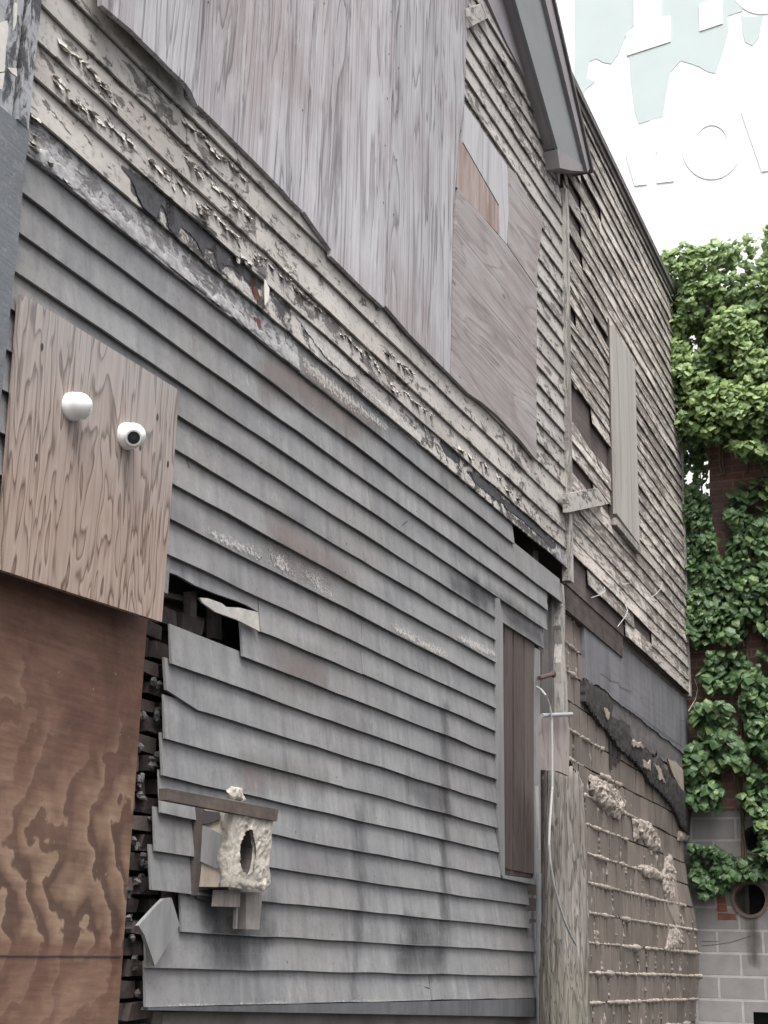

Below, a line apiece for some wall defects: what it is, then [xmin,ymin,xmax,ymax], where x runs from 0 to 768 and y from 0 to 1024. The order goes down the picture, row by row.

peeling [57,38,121,111]
peeling [52,74,136,148]
peeling [27,114,322,371]
peeling [339,333,415,375]
spalling [611,699,684,769]
spalling [589,774,677,902]
spalling [677,830,690,843]
spalling [664,927,683,951]